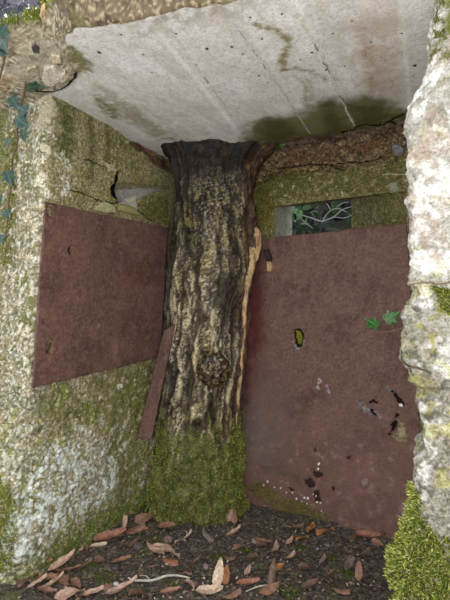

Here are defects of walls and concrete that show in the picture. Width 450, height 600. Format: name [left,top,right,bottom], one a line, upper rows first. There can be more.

crack [36,63,77,93]
crack [340,114,404,133]
corrosion [249,277,259,342]
corrosion [292,329,305,350]
corrosion [356,399,381,419]
corrosion [385,386,408,443]